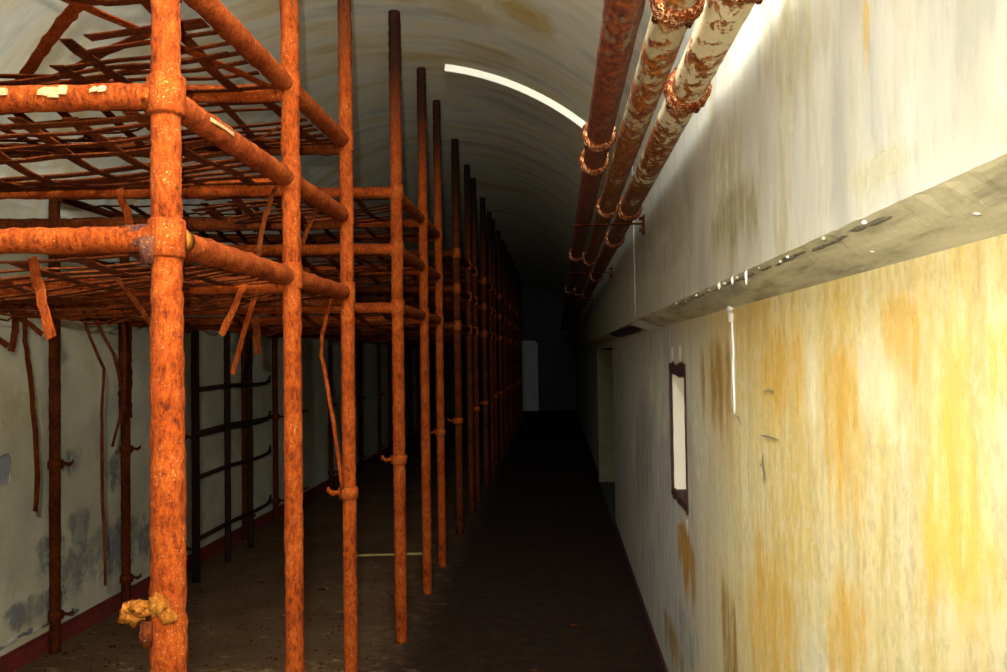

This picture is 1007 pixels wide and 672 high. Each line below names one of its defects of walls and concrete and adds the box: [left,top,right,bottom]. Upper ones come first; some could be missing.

water stain [610,326,641,337]
water stain [726,306,735,417]
water stain [62,512,150,586]